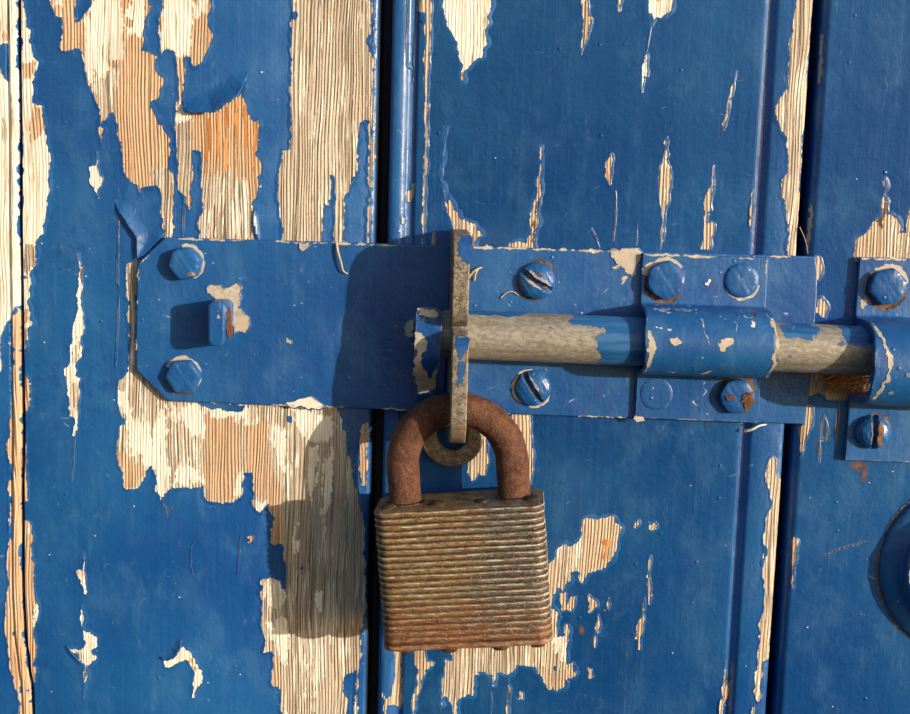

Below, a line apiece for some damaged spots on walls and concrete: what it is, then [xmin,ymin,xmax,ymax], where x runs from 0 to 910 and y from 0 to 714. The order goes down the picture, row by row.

peeling [0,0,55,714]
peeling [46,0,377,714]
peeling [404,0,496,246]
rust [726,392,755,413]
peeling [772,0,825,282]
peeling [815,295,831,321]
peeling [796,323,894,458]
peeling [850,176,910,279]
peeling [380,514,659,714]